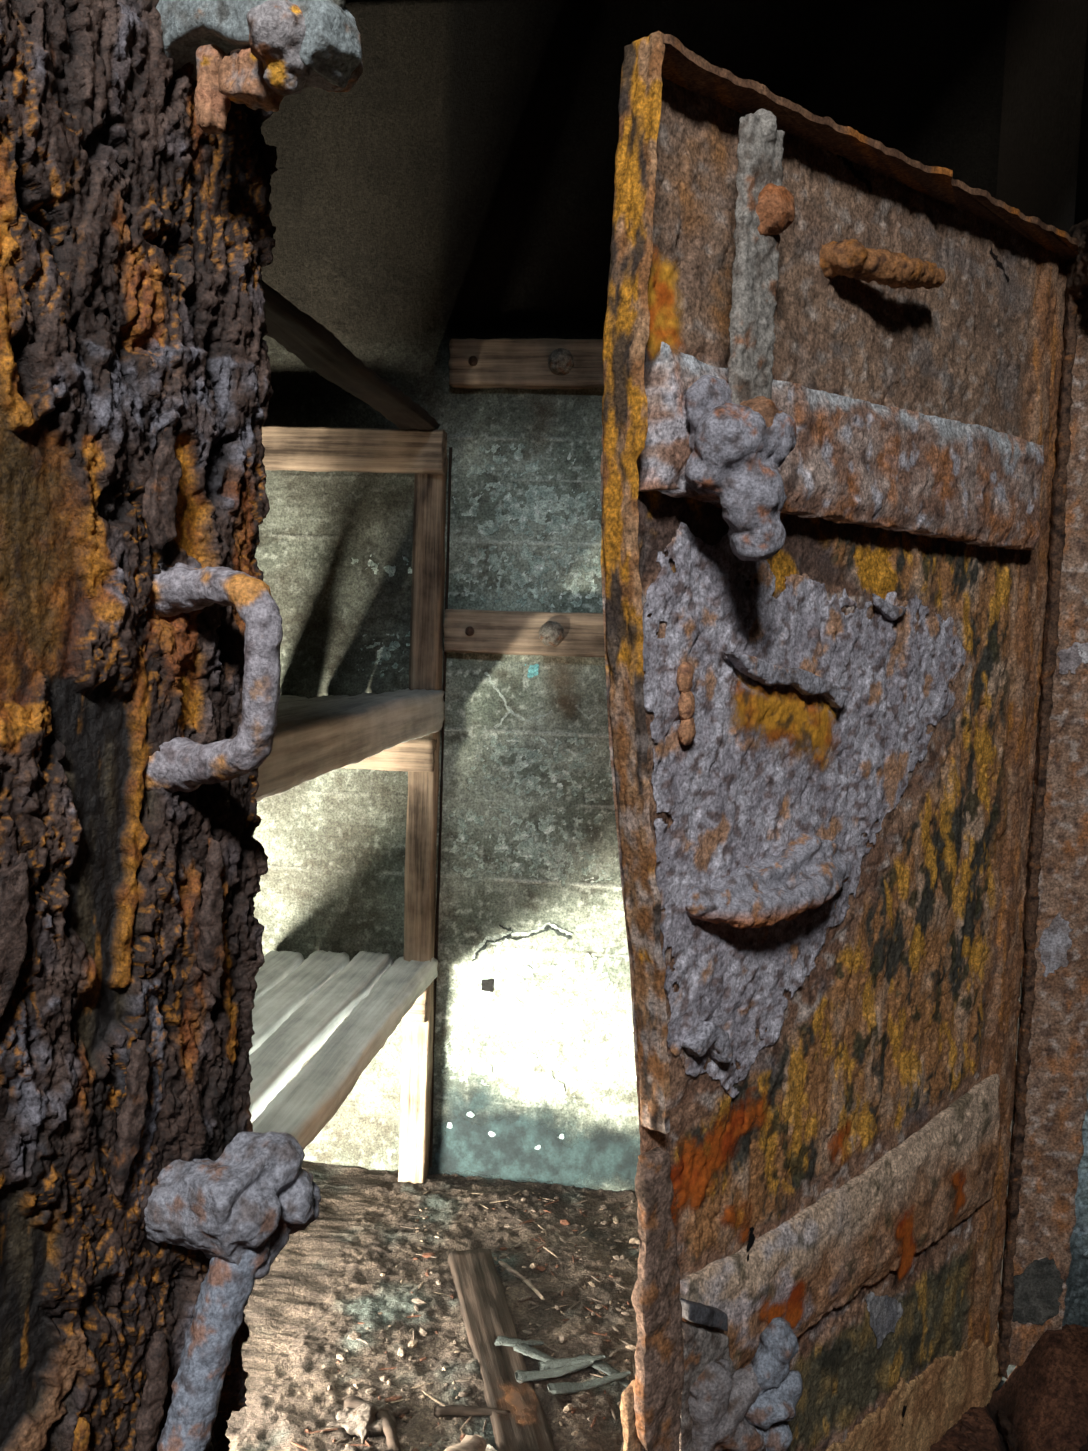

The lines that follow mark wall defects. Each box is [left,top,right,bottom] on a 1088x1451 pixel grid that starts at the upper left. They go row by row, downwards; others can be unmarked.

corrosion [647,251,682,356]
corrosion [732,681,834,766]
crack [472,922,572,961]
water stain [428,1083,641,1192]
corrosion [670,1100,765,1222]
corrosion [829,1122,851,1159]
corrosion [896,1207,916,1280]
corrosion [760,1281,805,1328]